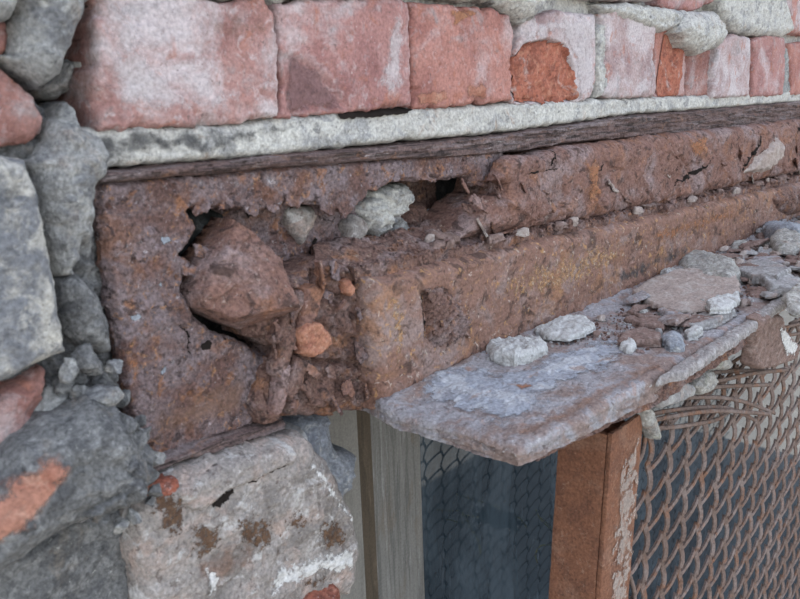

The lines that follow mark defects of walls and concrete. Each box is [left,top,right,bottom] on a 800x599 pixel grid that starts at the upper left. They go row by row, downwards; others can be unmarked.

rust [424,119,800,249]
rust [264,283,325,416]
spalling [293,321,332,357]
spalling [338,278,355,296]
rust [422,286,473,348]
rust [535,228,800,461]
spalling [661,325,704,353]
peeling [689,358,733,395]
peeling [612,409,662,599]